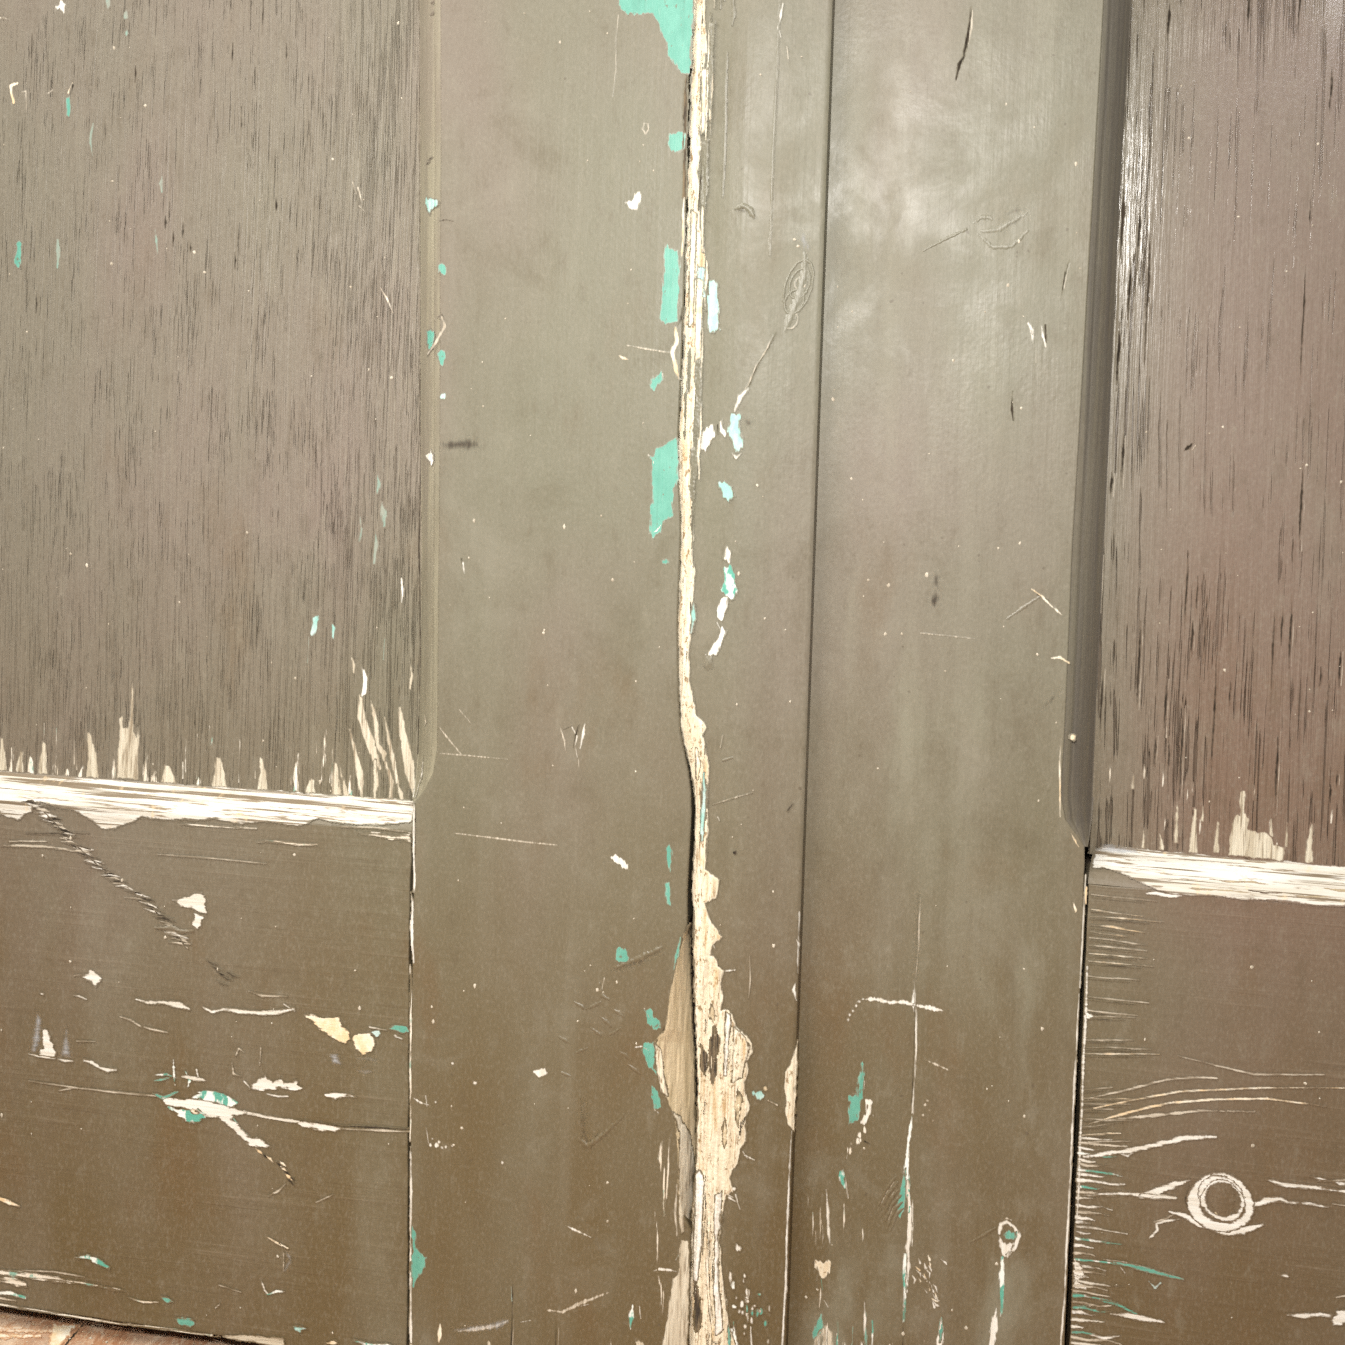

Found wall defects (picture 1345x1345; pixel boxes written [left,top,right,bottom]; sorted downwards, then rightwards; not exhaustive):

peeling [617,0,695,200]
peeling [659,243,721,333]
crack [743,332,777,391]
peeling [696,387,750,460]
peeling [648,437,680,539]
peeling [705,545,738,656]
peeling [0,770,415,949]
peeling [1091,845,1345,908]
peeling [201,1003,411,1055]
peeling [151,1059,305,1198]
peeling [634,1007,696,1234]
peeling [969,1217,1023,1345]